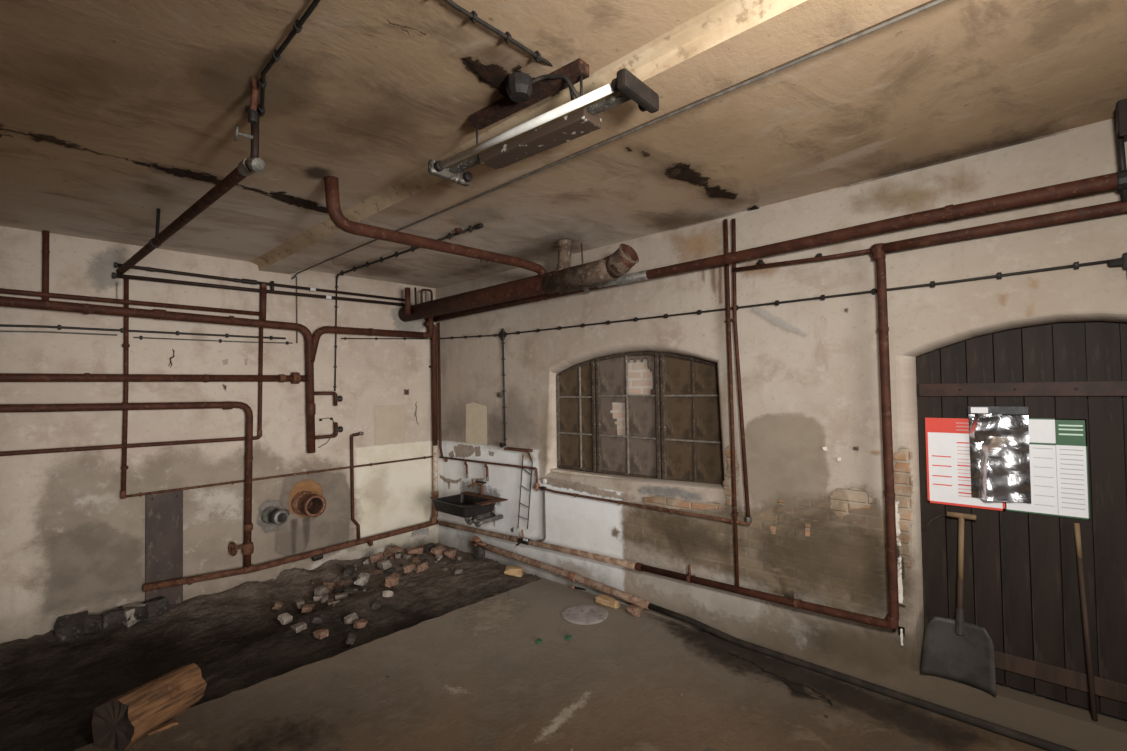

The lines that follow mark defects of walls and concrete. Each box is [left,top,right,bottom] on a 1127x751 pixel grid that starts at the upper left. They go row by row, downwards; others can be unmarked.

crack [0,124,189,175]
spalling [664,162,738,199]
leakage [746,415,828,505]
leakage [39,446,354,620]
spalling [545,446,914,613]